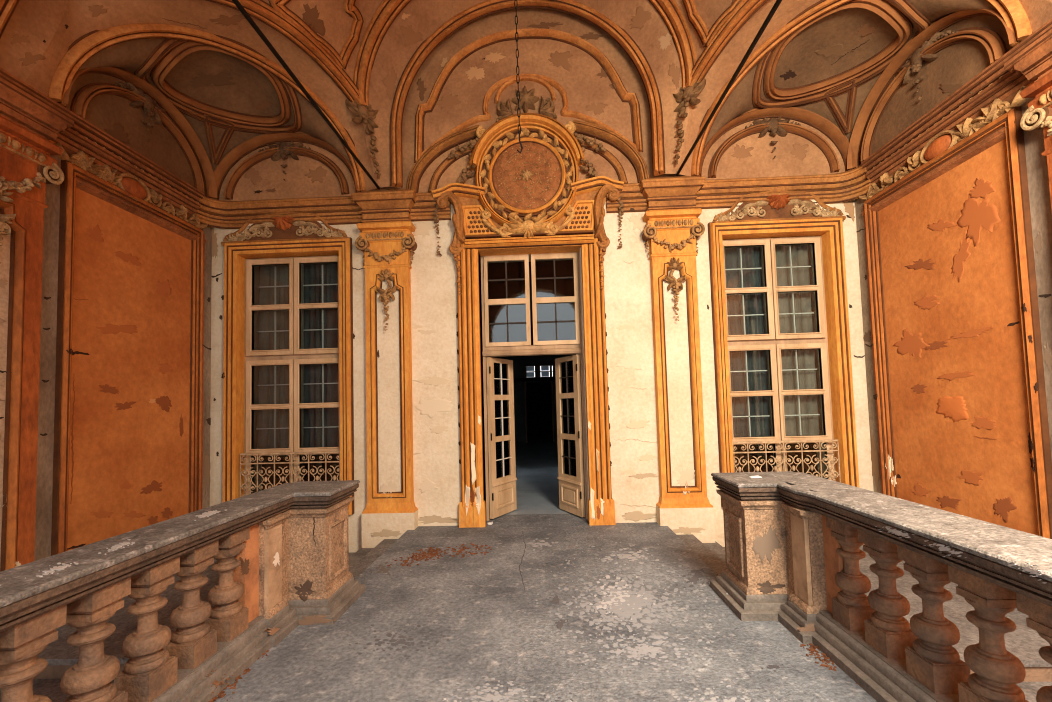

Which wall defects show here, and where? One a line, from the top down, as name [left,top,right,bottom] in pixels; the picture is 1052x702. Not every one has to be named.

peeling [458,441,481,515]
peeling [590,488,604,519]